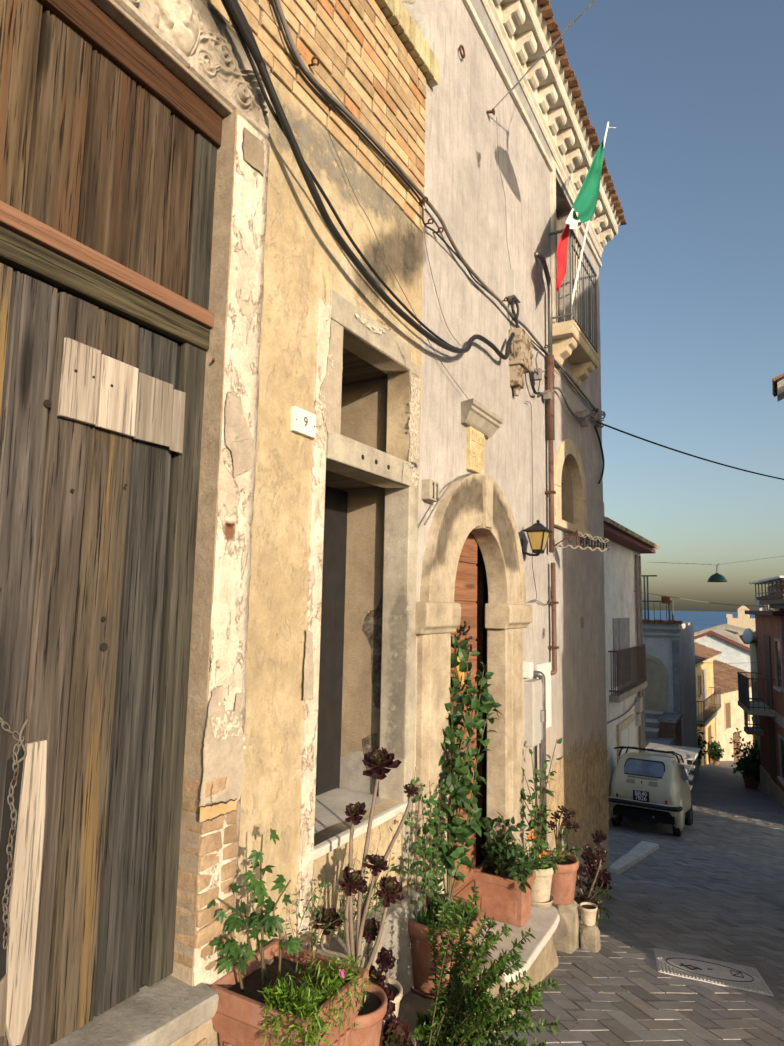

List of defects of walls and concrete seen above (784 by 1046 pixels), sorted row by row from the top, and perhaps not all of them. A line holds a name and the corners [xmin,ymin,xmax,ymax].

leakage [270,100,424,299]
spalling [361,592,383,711]